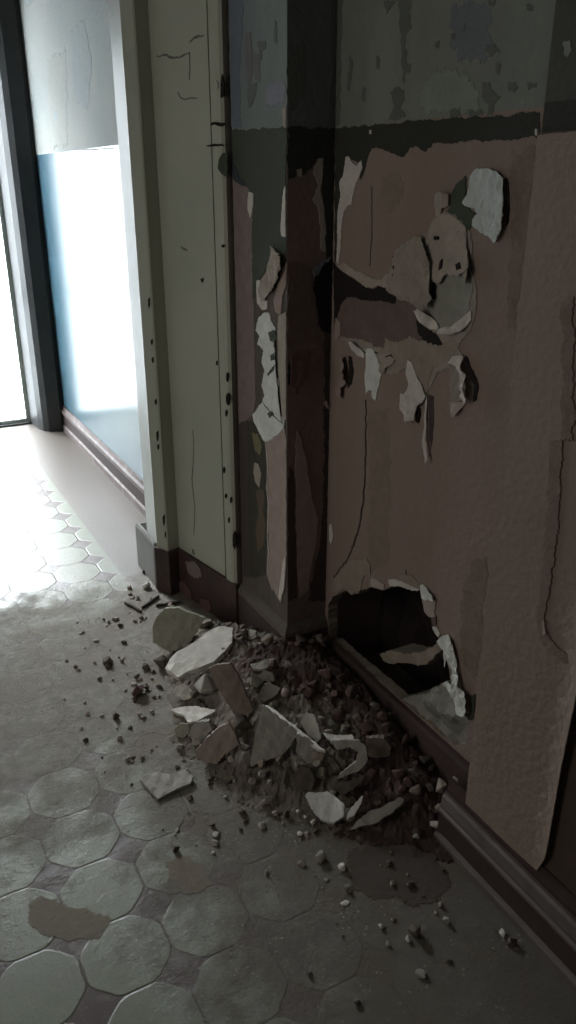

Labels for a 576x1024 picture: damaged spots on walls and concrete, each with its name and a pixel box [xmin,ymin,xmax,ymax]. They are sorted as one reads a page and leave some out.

crack [157,34,204,100]
peeling [228,168,504,578]
crack [333,400,367,578]
spalling [332,558,441,653]
flaking render [396,659,468,744]